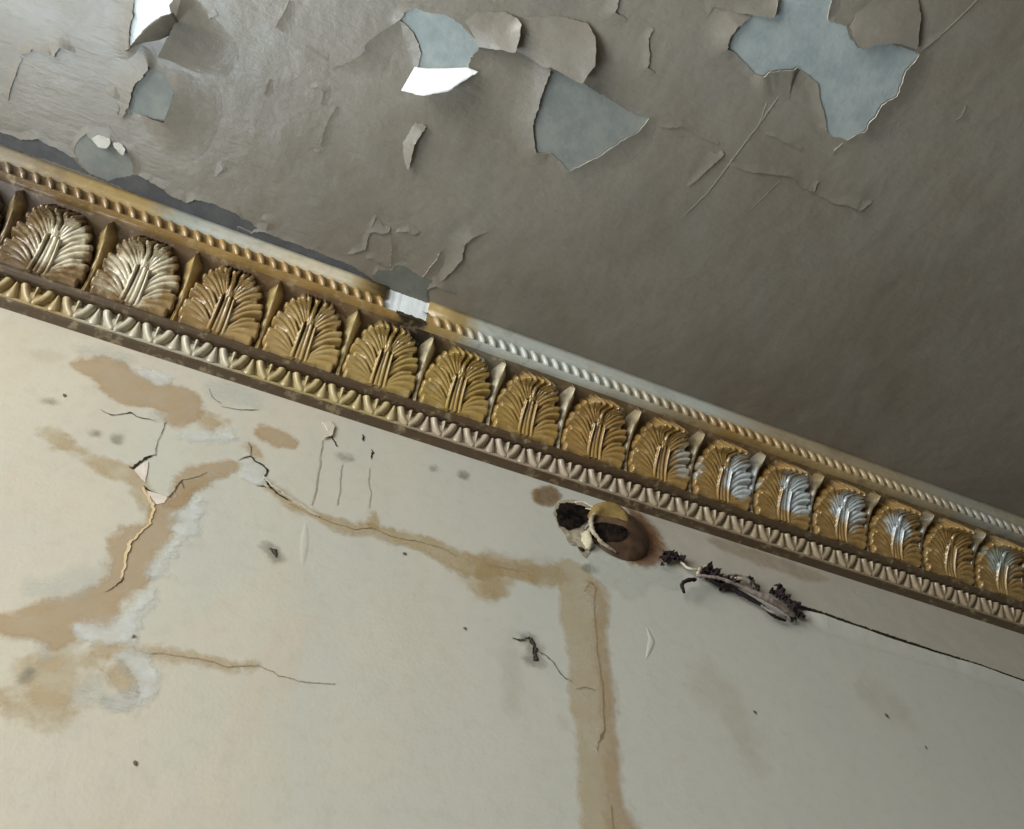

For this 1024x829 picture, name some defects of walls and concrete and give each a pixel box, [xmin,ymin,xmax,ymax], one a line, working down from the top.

peeling [0,0,487,324]
peeling [306,0,656,179]
peeling [697,0,942,156]
crack [103,411,207,498]
leakage [76,356,235,441]
leakage [248,427,297,456]
crack [239,444,456,556]
leakage [533,486,560,506]
leakage [0,461,270,710]
crack [538,581,605,752]
peeling [553,499,1024,694]
crack [802,608,1024,681]